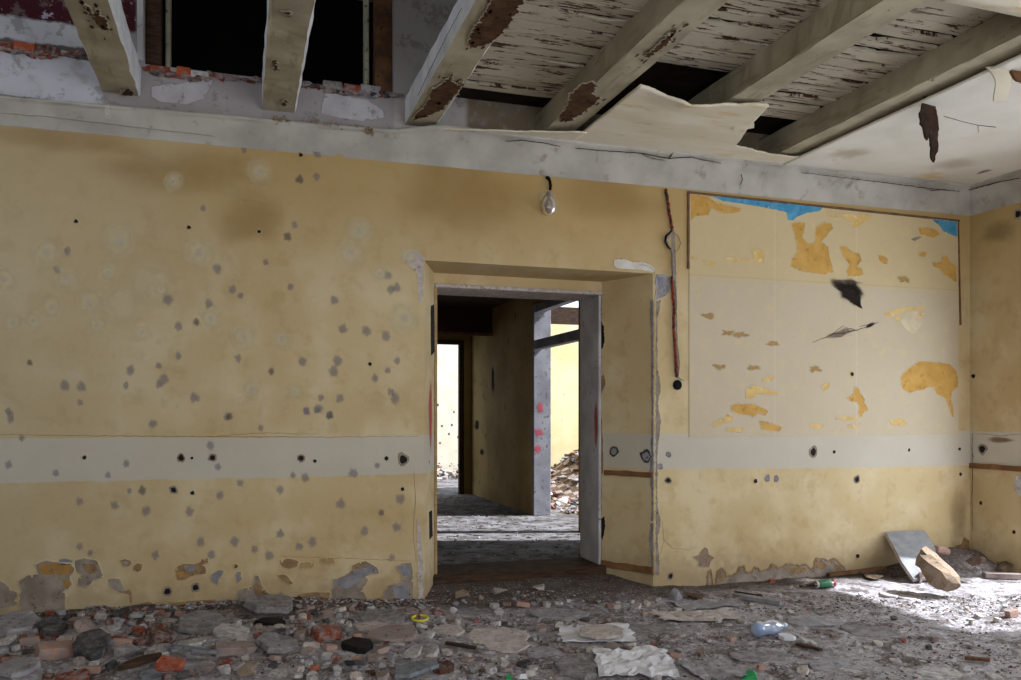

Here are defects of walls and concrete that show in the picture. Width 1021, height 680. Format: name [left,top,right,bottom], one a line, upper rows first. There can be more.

peeling [465,0,525,50]
peeling [411,73,465,121]
peeling [557,80,606,122]
crack [511,140,743,185]
peeling [690,194,872,278]
crack [812,322,878,343]
spalling [613,188,680,580]
peeling [711,375,782,433]
peeling [899,360,977,418]
spalling [0,557,144,613]
spalling [162,556,379,601]
spalling [691,546,846,585]